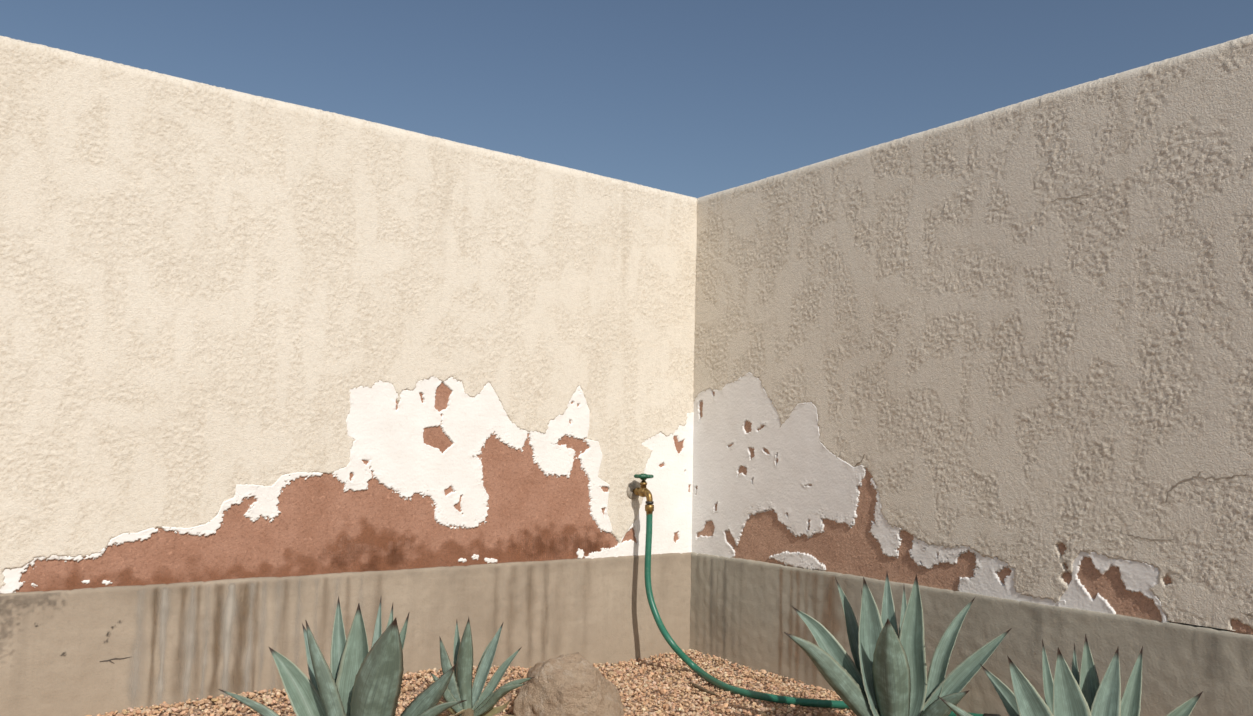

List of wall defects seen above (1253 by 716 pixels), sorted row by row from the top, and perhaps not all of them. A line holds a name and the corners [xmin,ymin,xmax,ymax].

flaking render [0,372,1180,624]
crack [1165,471,1246,503]
crack [1127,534,1174,544]